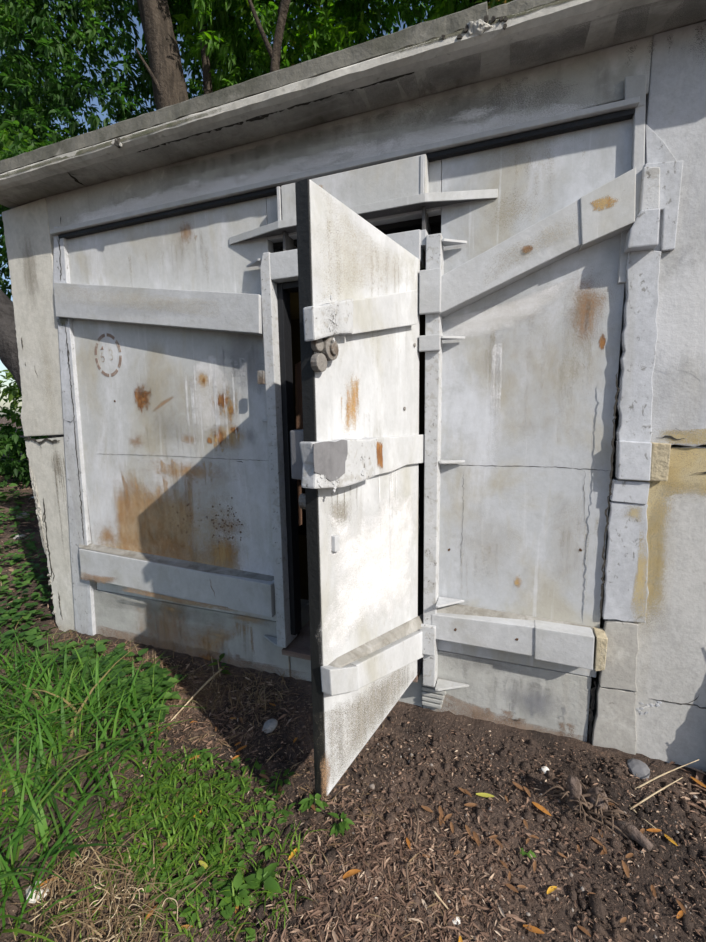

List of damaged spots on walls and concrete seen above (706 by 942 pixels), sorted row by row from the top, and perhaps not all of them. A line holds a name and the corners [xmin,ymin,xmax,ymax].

spalling [442,15,508,40]
crack [138,72,414,152]
corrosion [590,197,618,211]
crack [25,326,84,539]
corrosion [134,384,152,416]
corrosion [182,373,246,452]
corrosion [341,374,360,434]
crack [42,499,63,620]
damp [620,429,706,628]
crack [653,696,706,709]